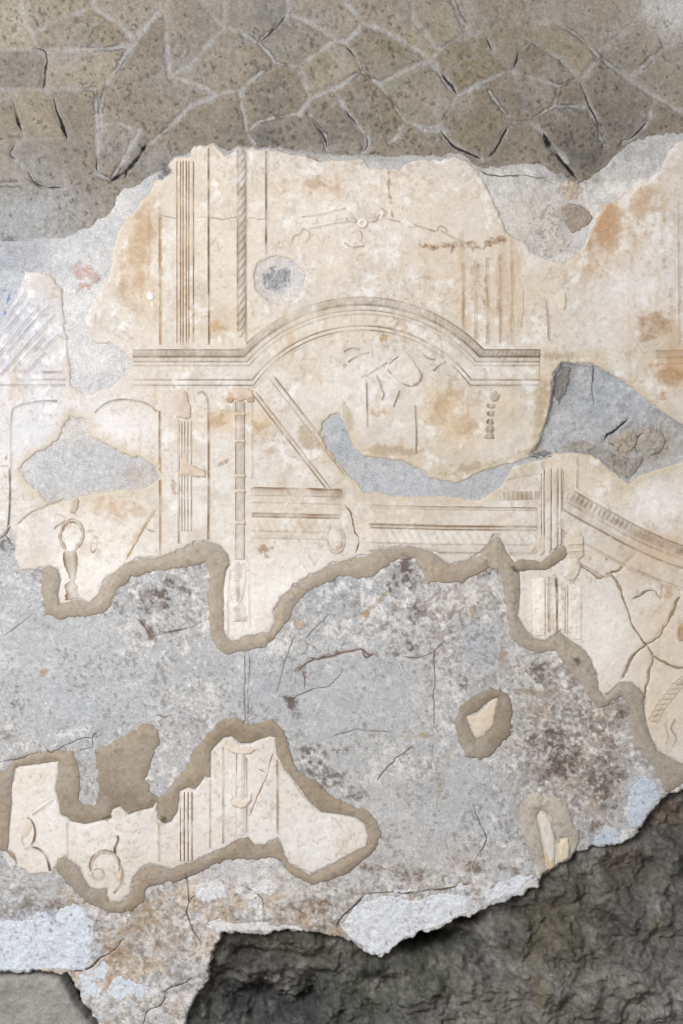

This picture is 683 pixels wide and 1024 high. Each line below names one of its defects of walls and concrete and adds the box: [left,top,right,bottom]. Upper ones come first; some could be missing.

crack [11,116,60,188]
crack [96,144,146,182]
crack [440,128,587,183]
flaking render [444,132,683,263]
flaking render [20,416,160,503]
flaking render [321,362,683,500]
crack [275,612,380,698]
crack [581,564,683,698]
flaking render [0,530,683,1024]